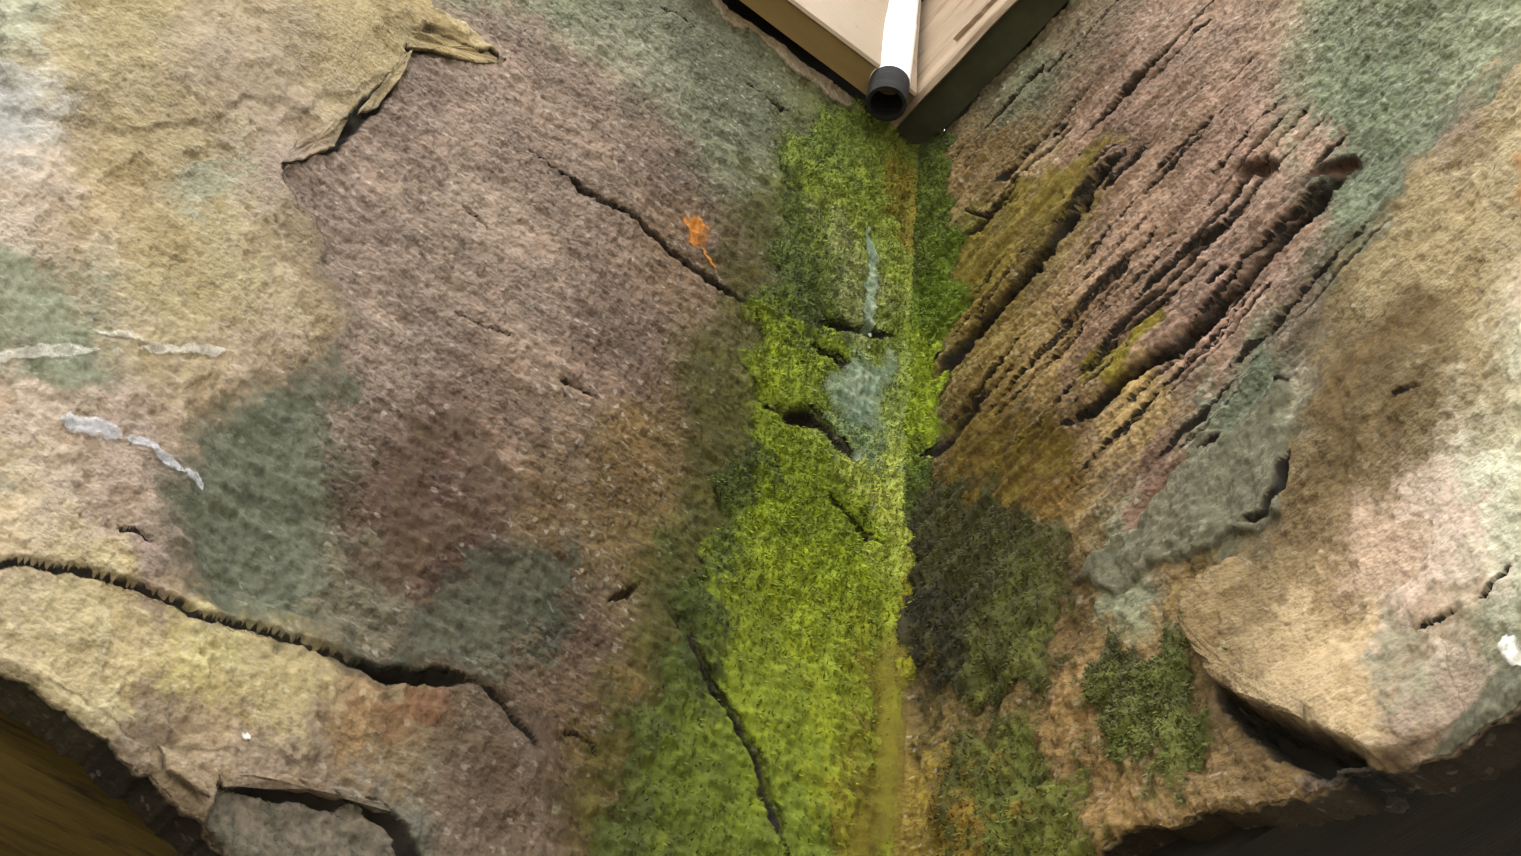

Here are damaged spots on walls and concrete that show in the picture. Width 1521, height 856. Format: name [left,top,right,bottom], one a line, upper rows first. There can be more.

peeling [157,0,856,856]
rust [683,216,716,268]
peeling [828,493,879,543]
peeling [819,318,895,340]
leakage [825,352,894,486]
leakage [859,226,879,348]
crack [923,139,1137,460]
peeling [862,0,1521,856]
crack [1059,154,1362,426]
crack [0,557,596,754]
crack [216,785,419,856]
leakage [832,640,908,856]